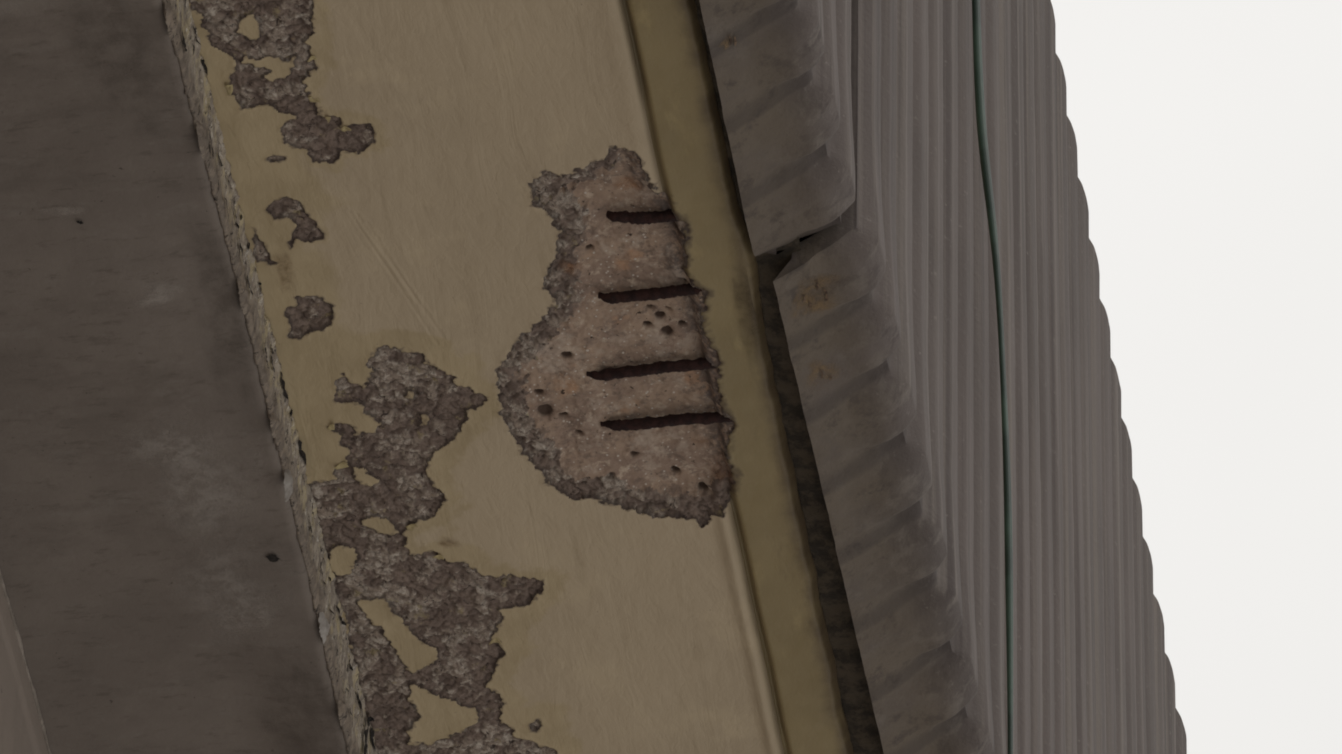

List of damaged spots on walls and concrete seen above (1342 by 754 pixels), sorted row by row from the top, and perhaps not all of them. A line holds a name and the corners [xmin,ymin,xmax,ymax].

spalling [162,0,736,754]